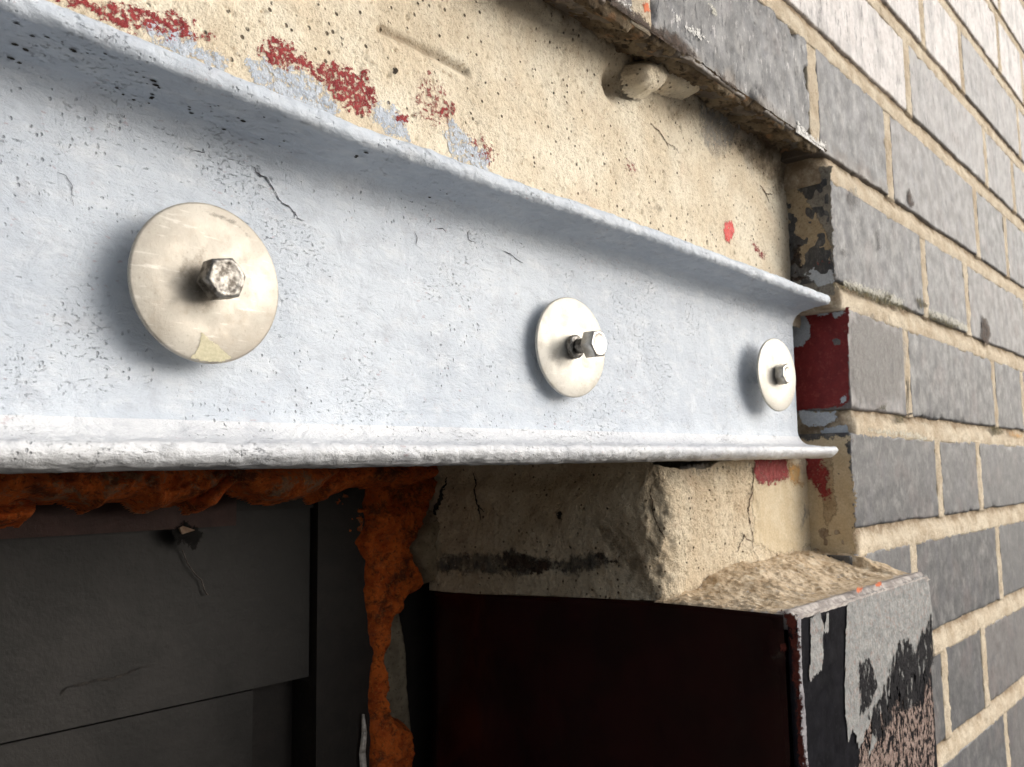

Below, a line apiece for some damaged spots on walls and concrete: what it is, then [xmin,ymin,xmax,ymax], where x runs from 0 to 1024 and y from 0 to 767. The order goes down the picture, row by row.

peeling [47,0,217,44]
peeling [257,35,378,116]
peeling [396,70,499,171]
crack [254,167,304,221]
peeling [792,311,850,348]
crack [433,477,447,515]
crack [473,473,484,520]
crack [738,467,756,555]
water stain [436,548,620,577]
peeling [809,612,829,682]
peeling [844,574,938,767]